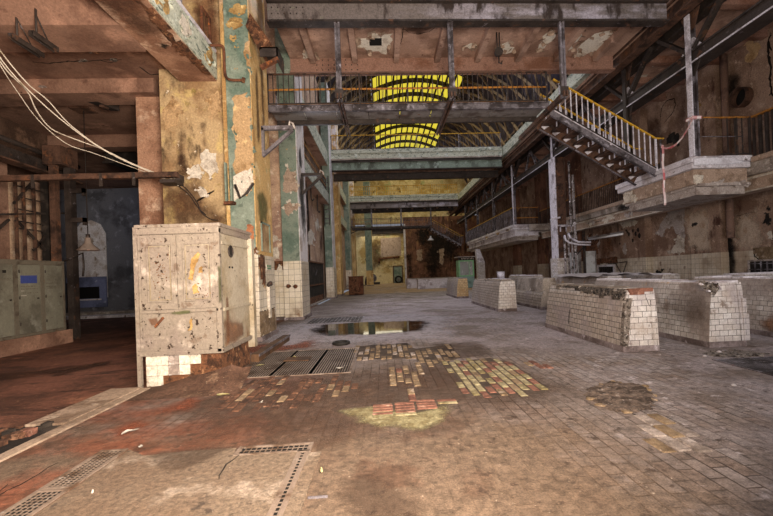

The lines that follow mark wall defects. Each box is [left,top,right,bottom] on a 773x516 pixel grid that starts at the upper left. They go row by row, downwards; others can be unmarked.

spalling [132,0,216,75]
flaking render [186,149,219,198]
peeling [204,91,256,201]
flaking render [650,209,698,255]
spalling [556,284,653,347]